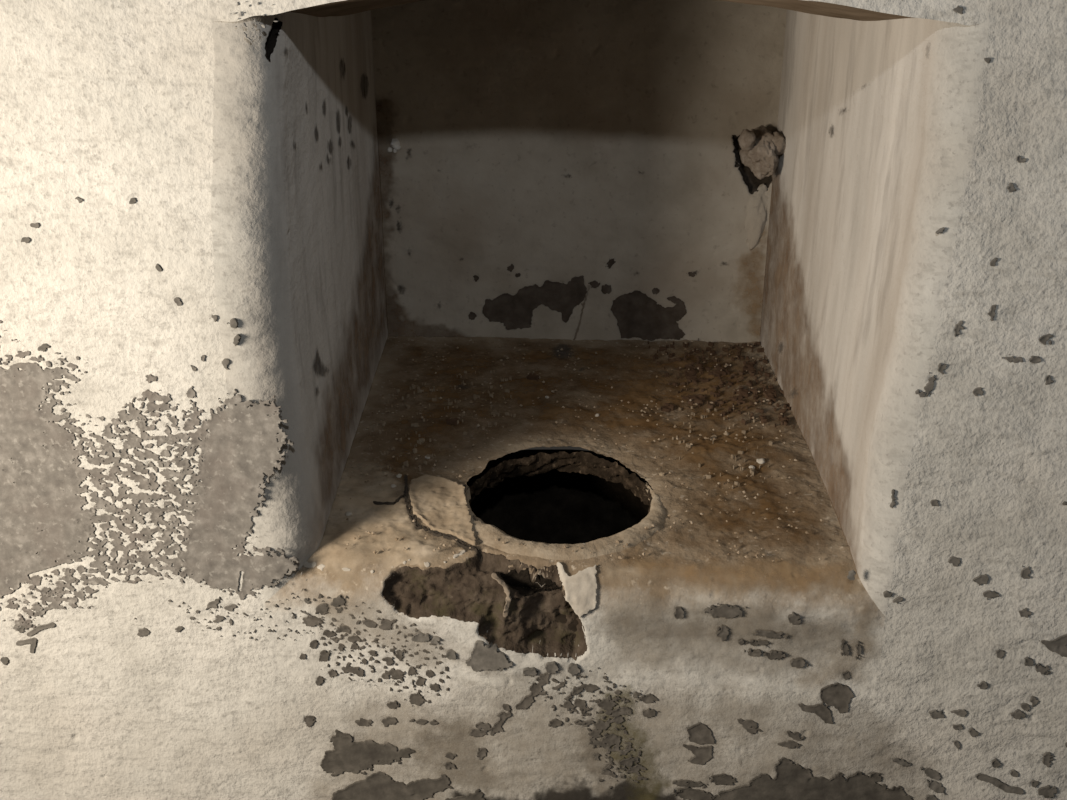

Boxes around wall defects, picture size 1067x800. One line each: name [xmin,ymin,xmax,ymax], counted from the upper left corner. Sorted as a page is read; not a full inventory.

flaking render [211,315,241,346]
flaking render [468,264,794,489]
damp [307,342,817,577]
crack [373,475,482,563]
peeling [0,320,659,800]
spalling [1024,657,1051,675]
spalling [1039,634,1067,657]
flaking render [683,722,715,765]
peeling [672,730,946,800]
spalling [929,709,979,750]
spalling [976,758,1057,798]
spalling [1010,696,1039,720]